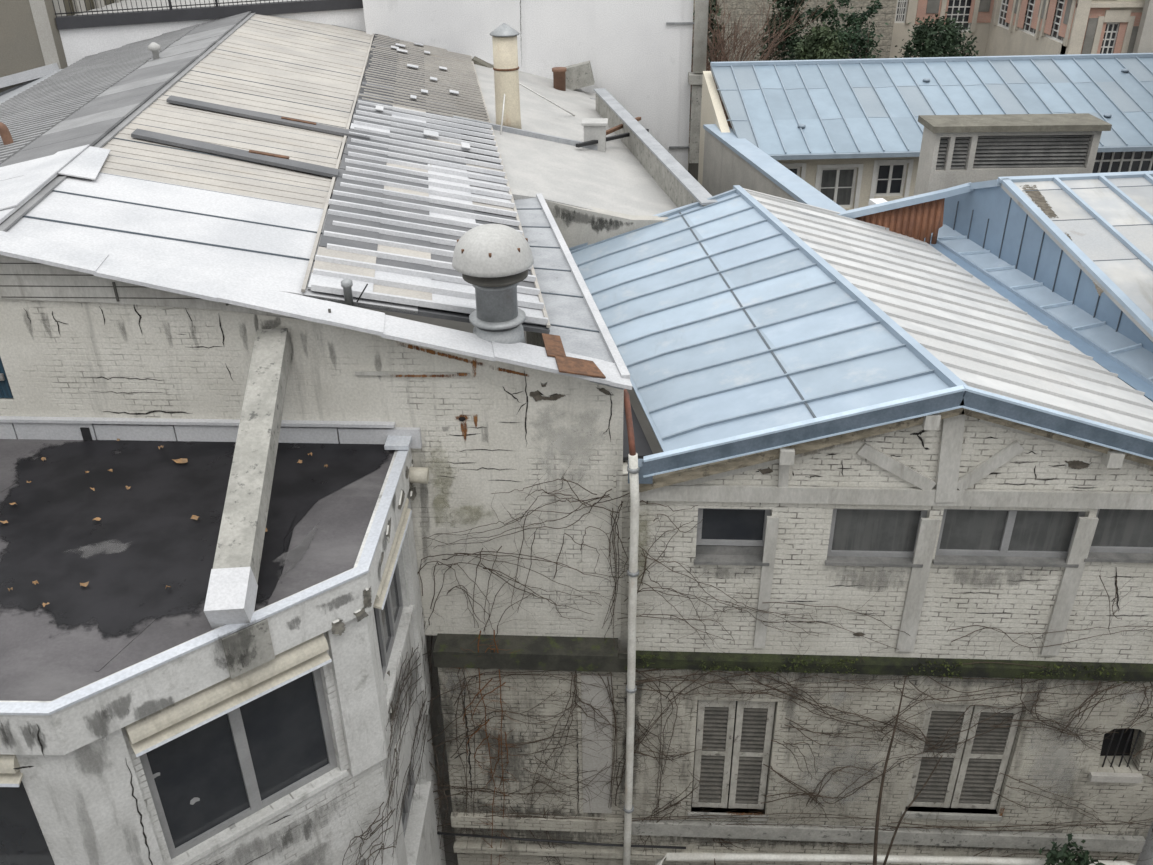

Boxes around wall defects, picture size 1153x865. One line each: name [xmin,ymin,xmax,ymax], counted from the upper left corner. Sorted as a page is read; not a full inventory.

crack [181,308,232,379]
rust [396,343,483,377]
flaking render [529,382,566,402]
rust [456,415,477,440]
peeling [332,587,372,636]
crack [787,585,875,623]
crack [957,580,1040,614]
crack [1104,569,1153,616]
crack [126,762,153,865]